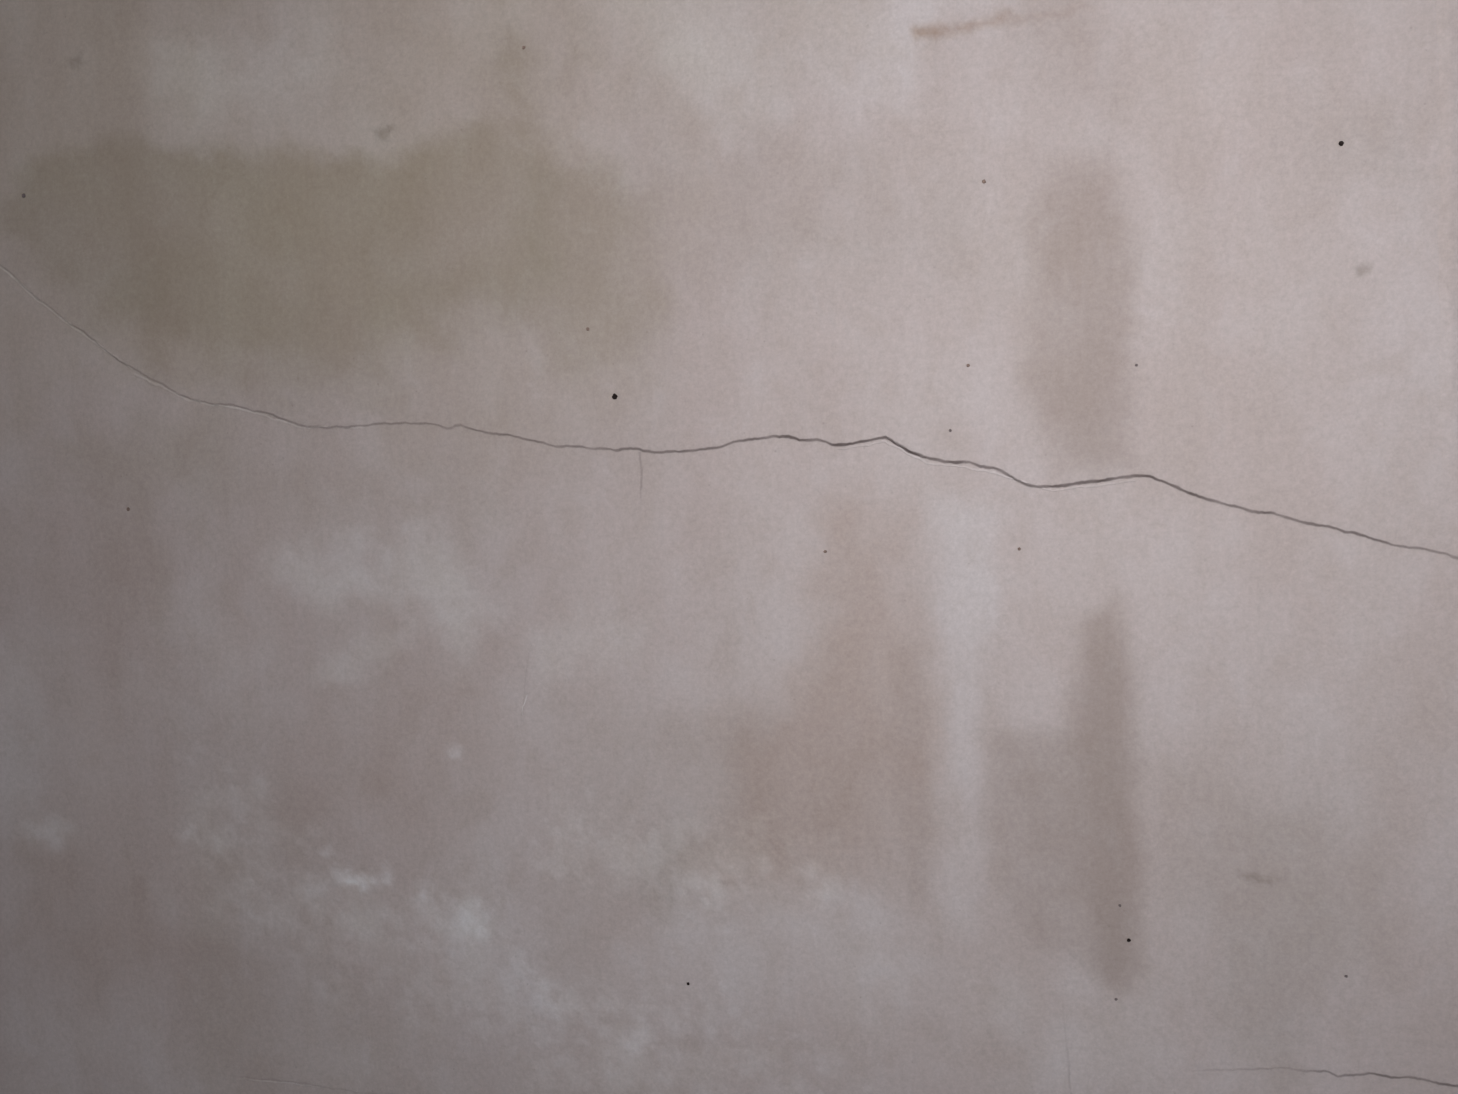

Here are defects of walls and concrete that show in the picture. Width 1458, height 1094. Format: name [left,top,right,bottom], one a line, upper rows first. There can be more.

crack [0,265,365,430]
water stain [0,0,1170,508]
crack [750,435,1203,498]
water stain [0,389,1458,1094]